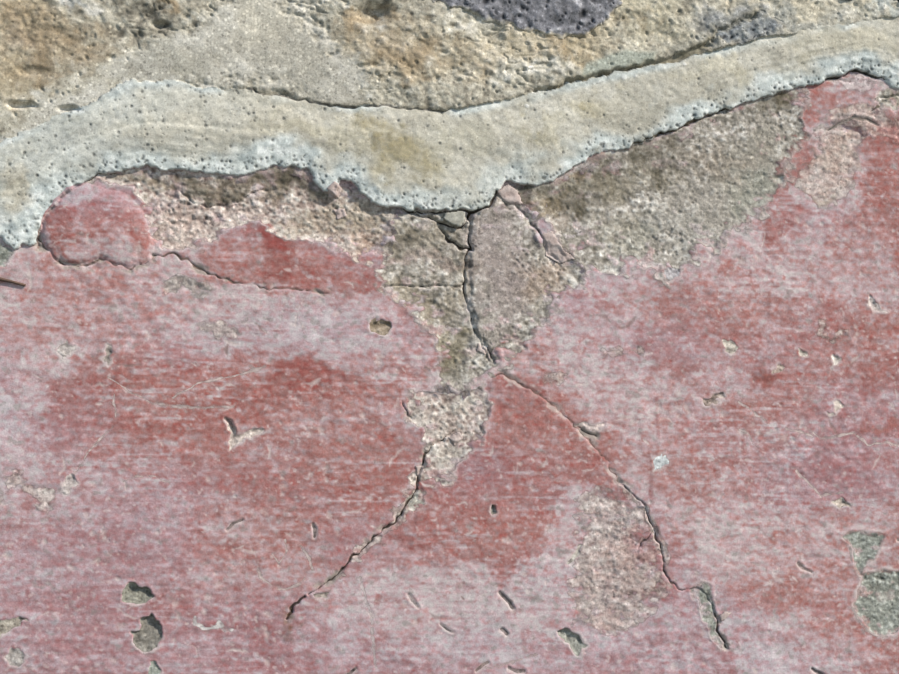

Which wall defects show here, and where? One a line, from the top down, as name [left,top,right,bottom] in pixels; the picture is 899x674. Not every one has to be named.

crack [240,87,453,112]
crack [631,108,729,146]
crack [824,69,885,111]
crack [383,190,516,297]
spalling [85,73,899,563]
crack [486,345,690,591]
peeling [122,582,154,604]
peeling [130,614,162,674]
crack [285,431,453,620]
spalling [557,480,671,656]
spalling [690,582,731,649]
spalling [842,530,899,636]